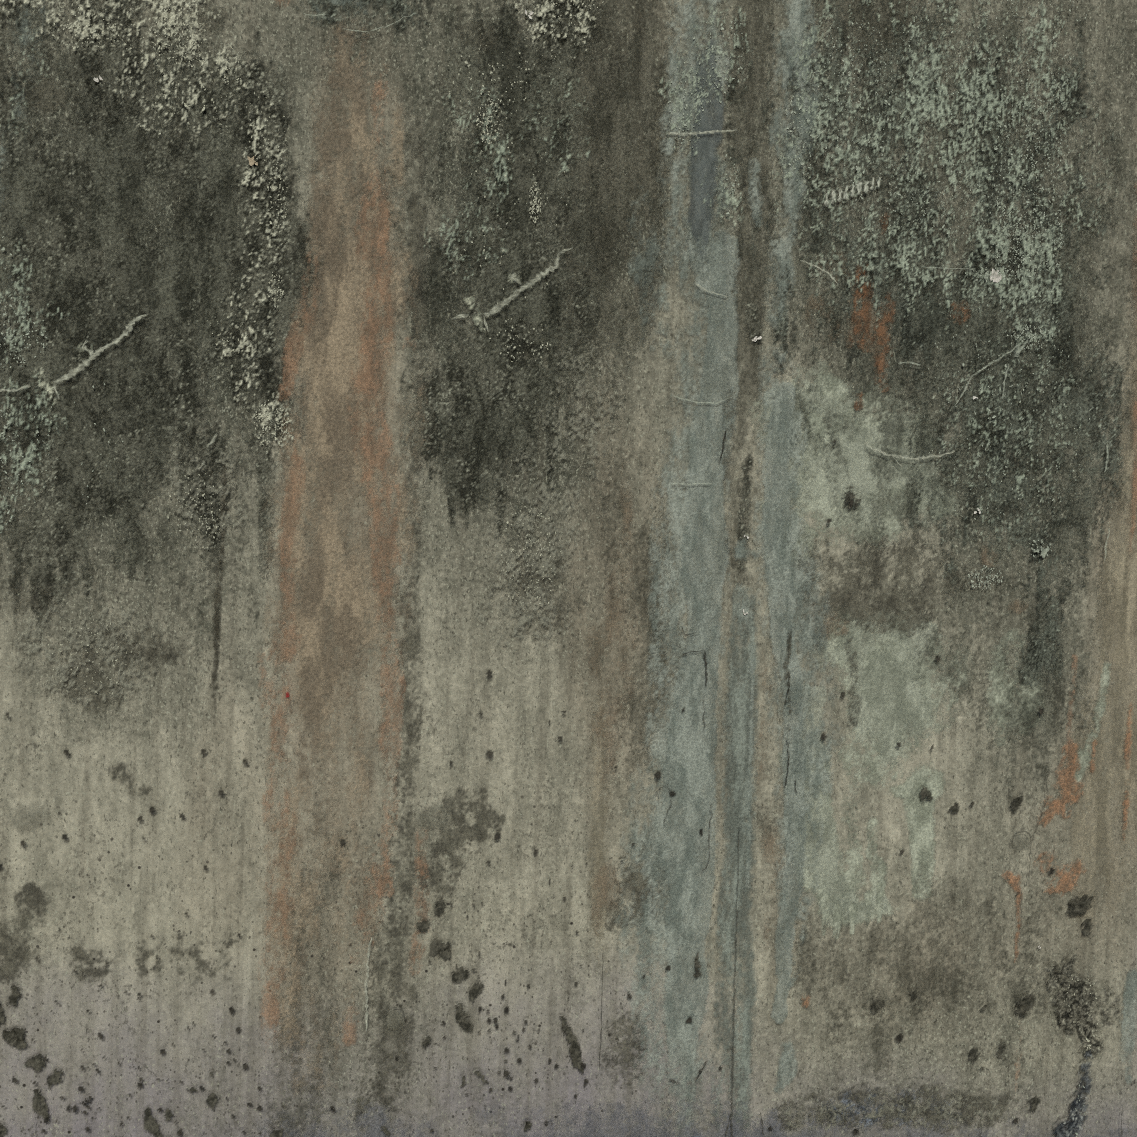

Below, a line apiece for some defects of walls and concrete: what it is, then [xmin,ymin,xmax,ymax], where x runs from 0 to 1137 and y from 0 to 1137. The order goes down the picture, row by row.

damp [0,0,323,696]
corrosion [271,27,410,1026]
damp [394,0,1137,1137]
damp [59,622,178,712]
damp [112,763,150,795]
damp [0,883,47,979]
damp [73,947,109,979]
damp [136,936,236,975]
damp [354,788,505,1136]